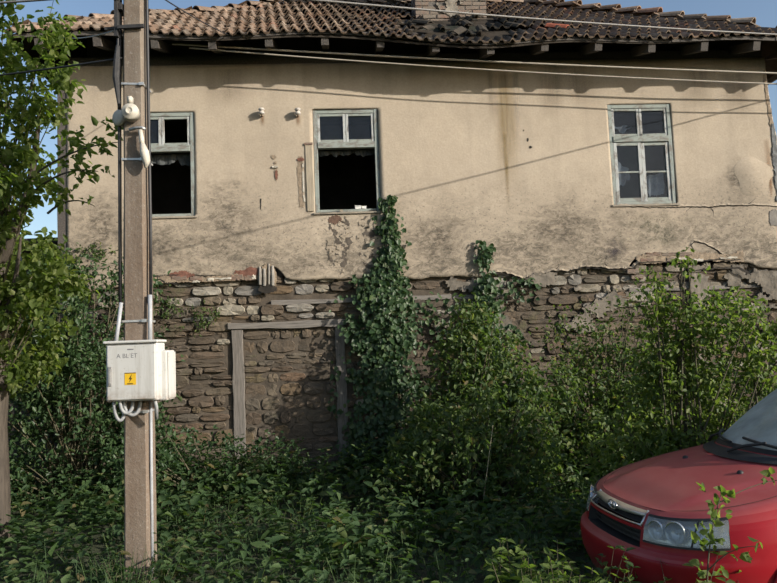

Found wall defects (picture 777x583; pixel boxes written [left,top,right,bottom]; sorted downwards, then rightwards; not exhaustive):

peeling [297,156,306,208]
crack [619,198,777,216]
peeling [326,209,382,274]
spalling [153,266,258,285]
flaking render [445,276,480,292]
flaking render [524,272,557,287]
flaking render [625,250,777,311]
flaking render [495,298,525,336]
flaking render [563,290,631,333]